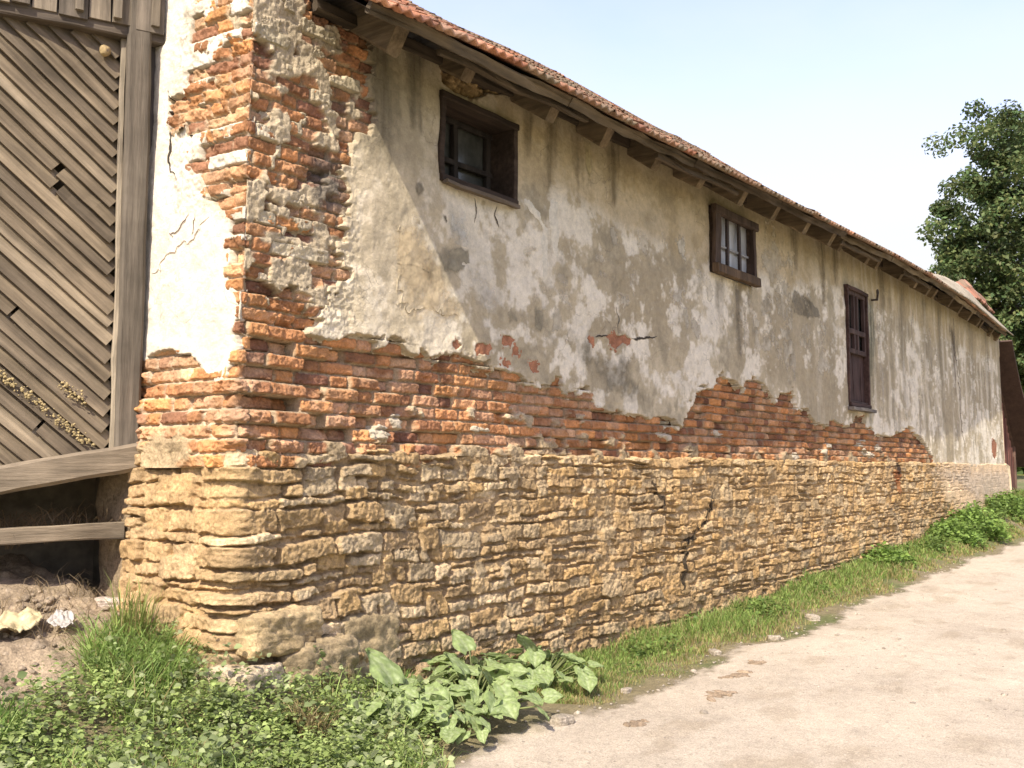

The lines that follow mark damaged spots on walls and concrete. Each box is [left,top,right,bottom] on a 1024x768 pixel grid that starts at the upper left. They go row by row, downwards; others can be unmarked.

crack [152,212,206,274]
flaking render [134,0,933,468]
crack [595,307,657,341]
crack [651,478,666,513]
crack [681,488,715,591]